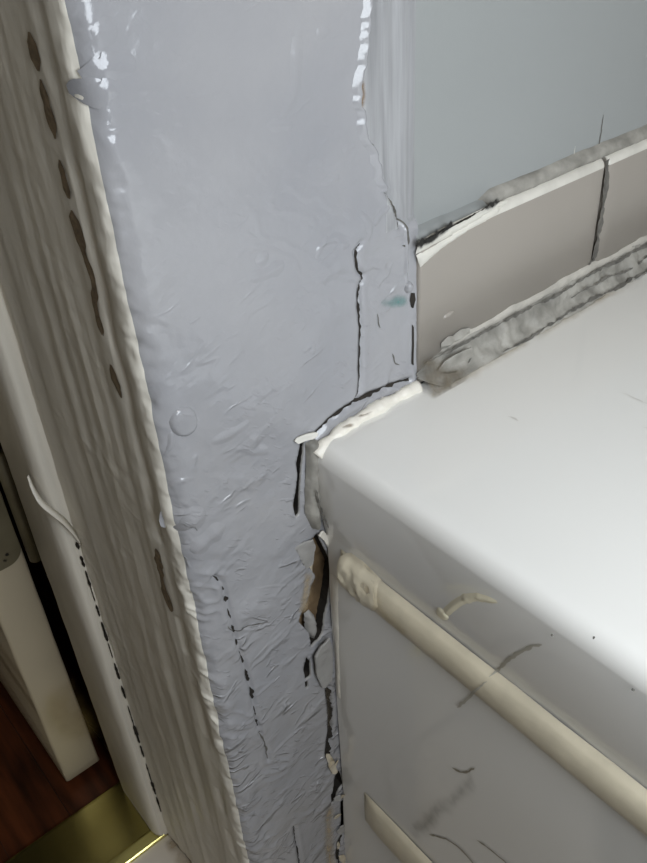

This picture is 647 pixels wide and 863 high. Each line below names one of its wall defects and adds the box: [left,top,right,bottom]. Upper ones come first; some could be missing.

crack [294,243,409,444]
crack [385,193,485,247]
crack [424,159,647,364]
spalling [295,530,333,688]